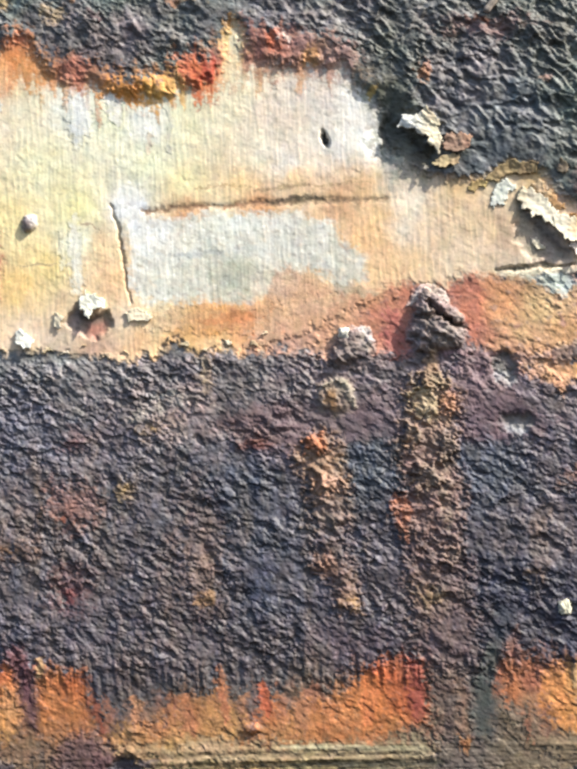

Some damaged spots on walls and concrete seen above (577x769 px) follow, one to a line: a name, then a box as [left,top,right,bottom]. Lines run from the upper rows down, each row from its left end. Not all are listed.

rust [20,213,40,234]
rust [0,0,379,129]
peeling [0,64,577,367]
rust [0,261,577,769]